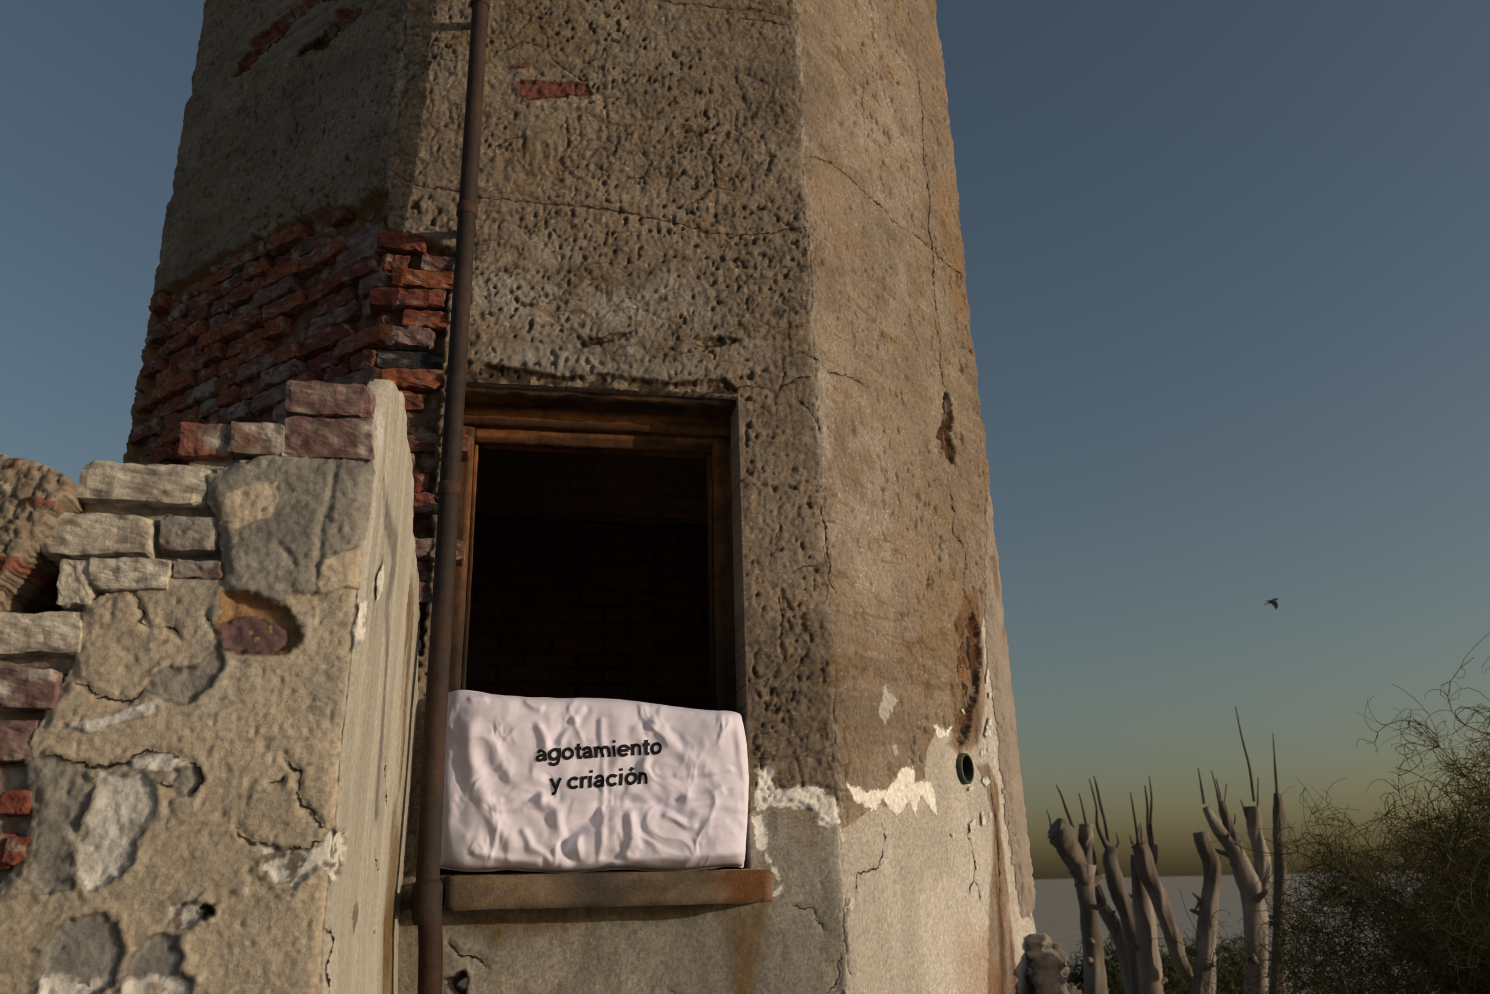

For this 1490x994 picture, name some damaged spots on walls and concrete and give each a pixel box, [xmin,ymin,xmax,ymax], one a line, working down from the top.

crack [397,65,964,384]
flaking render [128,206,455,465]
peeling [206,455,384,655]
flaking render [407,433,438,518]
flaking render [414,537,434,652]
flaking render [466,361,738,394]
spalling [936,392,958,468]
crack [946,473,970,606]
spalling [957,612,992,756]
peeling [75,753,202,891]
crack [236,757,327,851]
peeling [38,902,215,994]